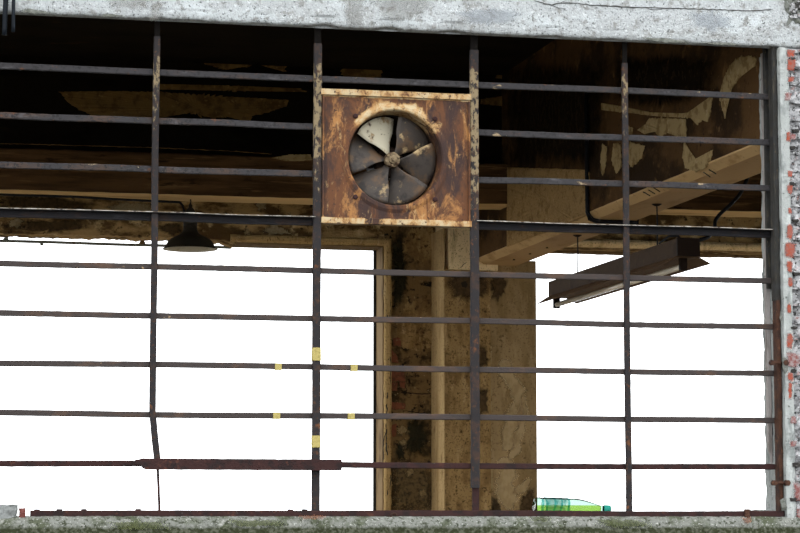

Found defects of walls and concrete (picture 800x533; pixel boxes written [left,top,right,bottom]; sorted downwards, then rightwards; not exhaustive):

crack [536,0,770,11]
spalling [787,50,796,81]
peeling [59,84,307,121]
peeling [600,55,757,176]
spalling [786,129,799,150]
water stain [0,196,92,209]
water stain [10,220,87,233]
spalling [785,208,800,286]
water stain [392,239,408,310]
spalling [782,326,800,398]
mould [395,420,427,459]
spalling [780,483,800,517]